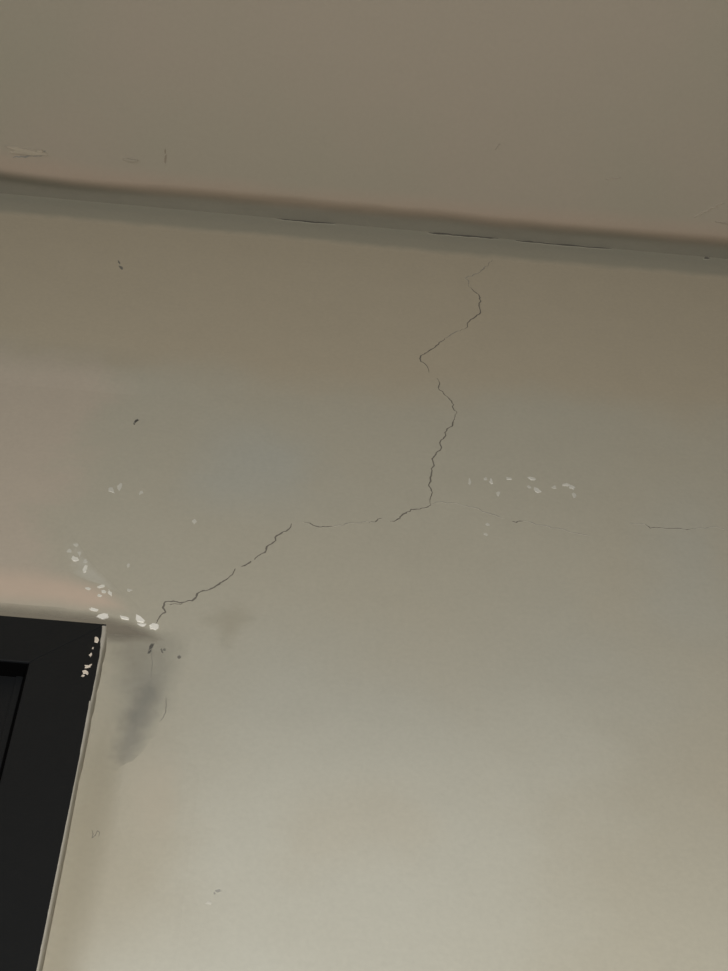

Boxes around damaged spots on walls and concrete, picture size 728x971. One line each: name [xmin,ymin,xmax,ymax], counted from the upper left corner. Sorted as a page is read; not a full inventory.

peeling [90,607,159,630]
crack [156,232,612,624]